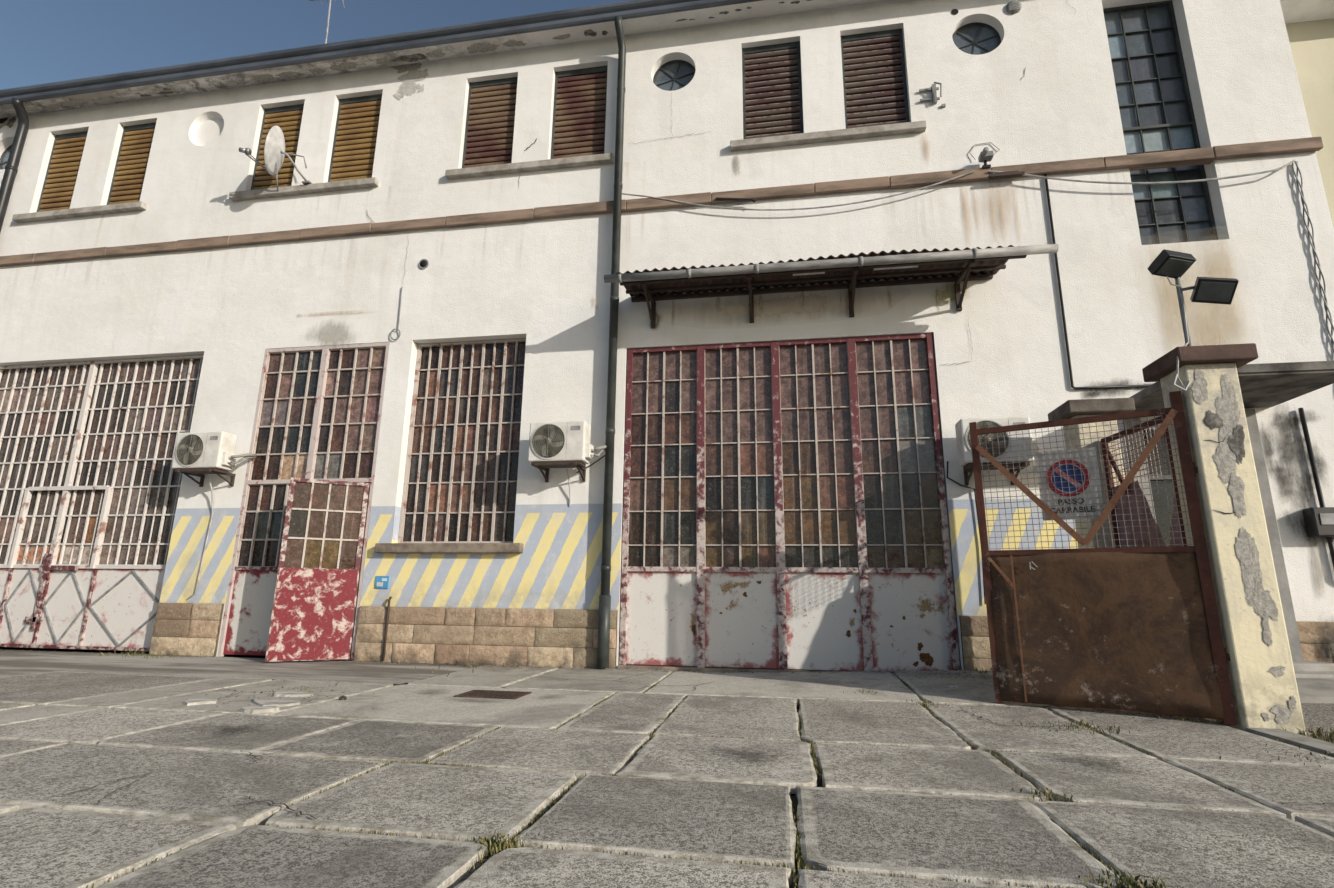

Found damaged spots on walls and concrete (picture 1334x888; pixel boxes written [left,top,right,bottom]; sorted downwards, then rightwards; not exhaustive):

flaking render [376,50,445,99]
flaking render [0,117,16,128]
peeling [1191,369,1278,646]
damp [1262,415,1334,586]
peeling [1267,666,1285,677]
peeling [1262,695,1297,724]
crack [43,772,151,805]